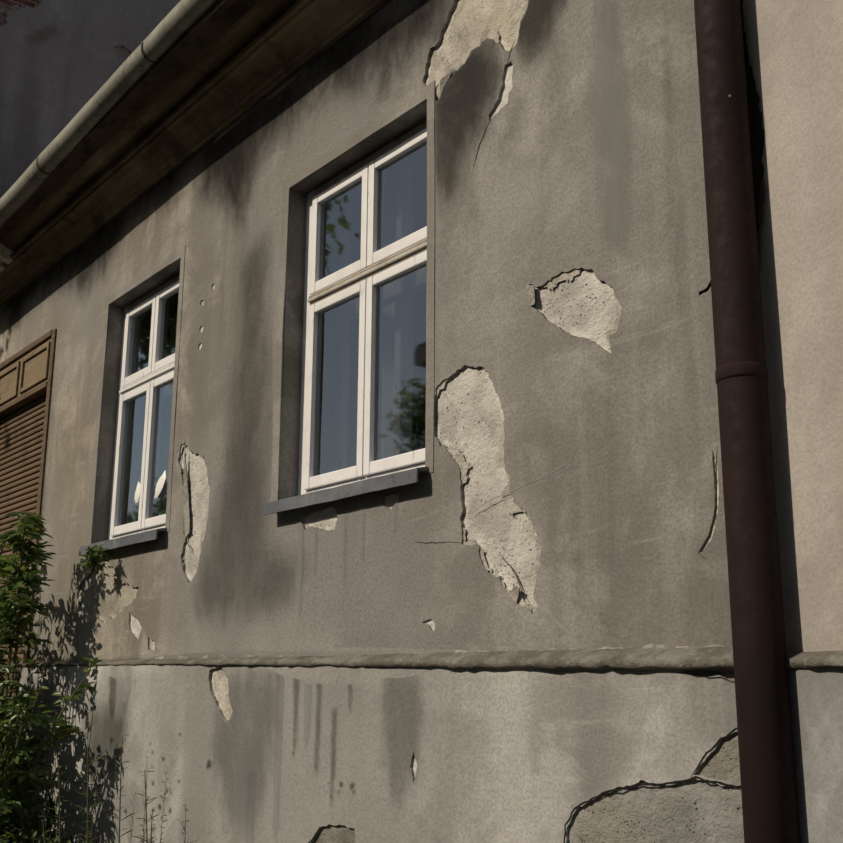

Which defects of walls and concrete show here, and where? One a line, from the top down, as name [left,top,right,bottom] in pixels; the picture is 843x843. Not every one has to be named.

flaking render [0,0,42,26]
flaking render [115,45,132,61]
peeling [423,0,528,124]
peeling [526,267,622,353]
peeling [178,442,210,583]
peeling [300,507,338,531]
peeling [381,493,399,510]
peeling [434,365,542,614]
crack [698,454,718,559]
flaking render [202,654,233,723]
flaking render [566,731,744,843]
flaking render [311,824,356,843]